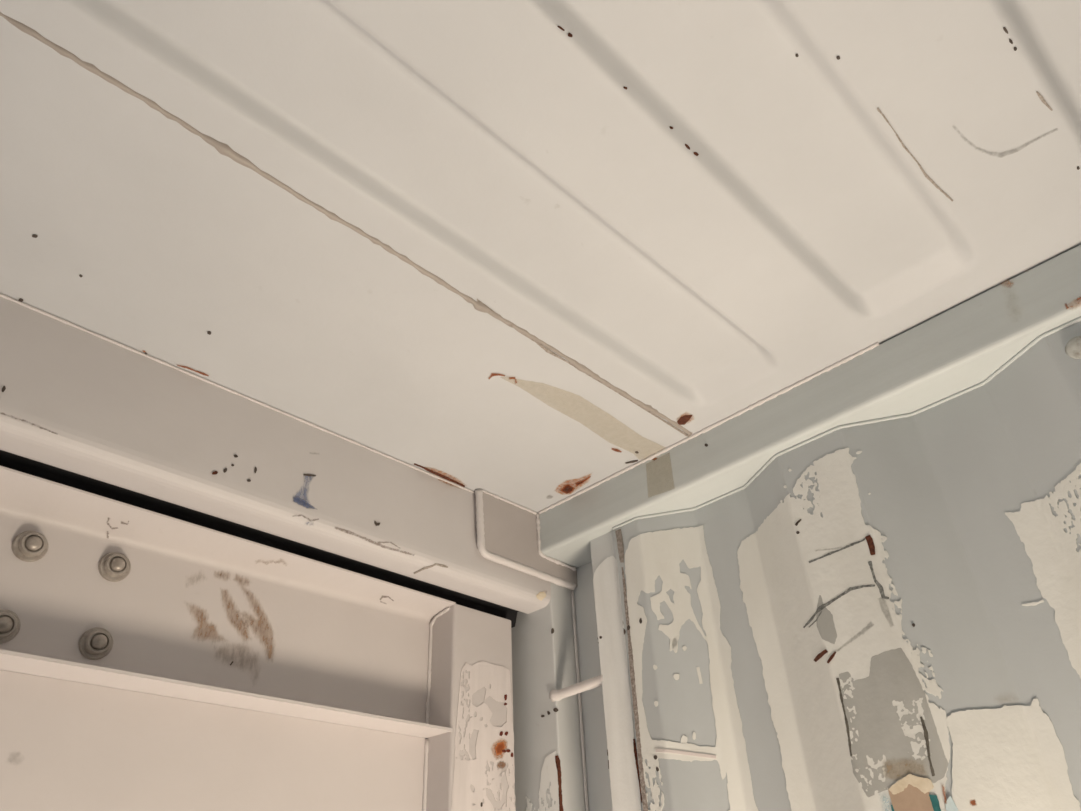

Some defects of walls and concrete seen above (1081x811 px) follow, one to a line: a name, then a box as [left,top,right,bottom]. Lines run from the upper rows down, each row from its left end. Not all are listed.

corrosion [557,475,591,494]
water stain [196,611,216,638]
water stain [224,591,272,658]
peeling [737,448,1081,811]
peeling [593,525,758,811]
corrosion [494,731,513,768]
peeling [451,661,559,811]